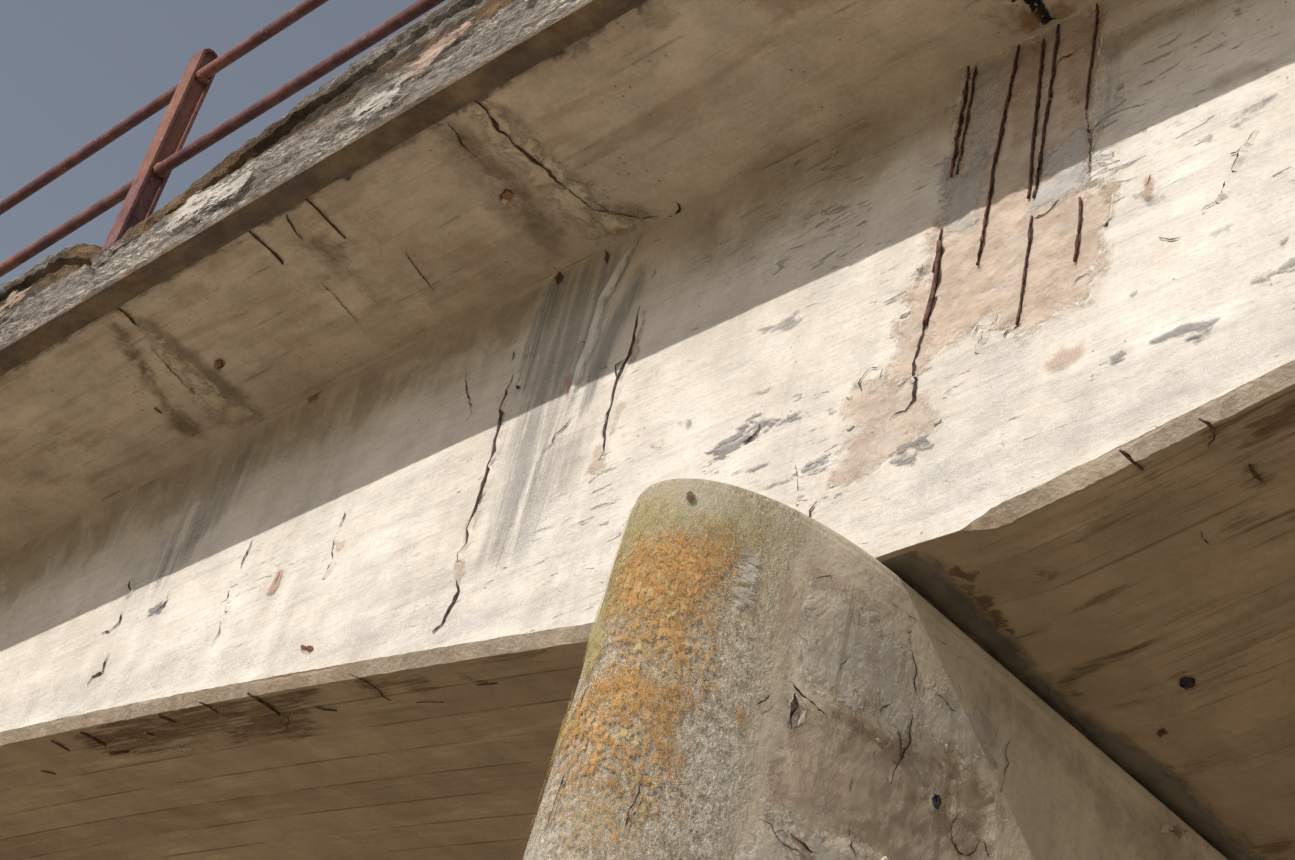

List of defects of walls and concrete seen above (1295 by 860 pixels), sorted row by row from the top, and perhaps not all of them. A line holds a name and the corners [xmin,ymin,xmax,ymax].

crack [448,124,480,160]
crack [472,101,681,219]
spalling [889,0,1120,420]
water stain [470,97,659,529]
crack [587,271,655,471]
crack [432,352,521,633]
water stain [77,688,317,754]
flaking render [788,583,997,769]
flaking render [736,811,865,860]